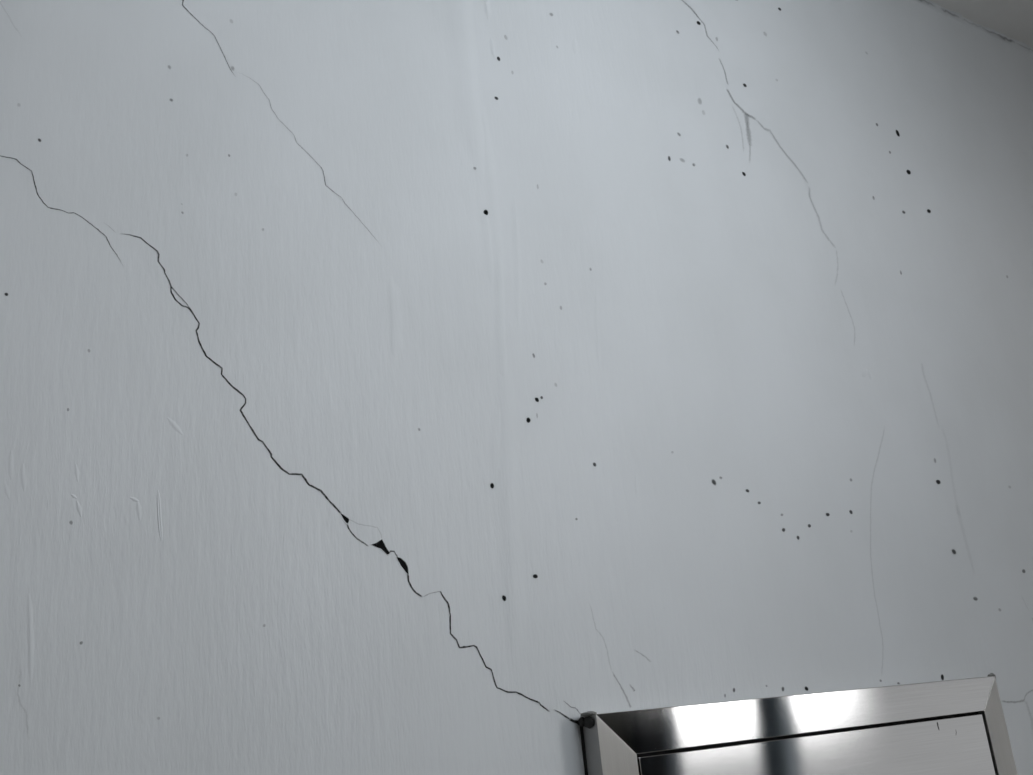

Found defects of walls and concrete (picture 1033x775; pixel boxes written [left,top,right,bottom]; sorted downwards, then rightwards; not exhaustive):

crack [1,156,581,725]